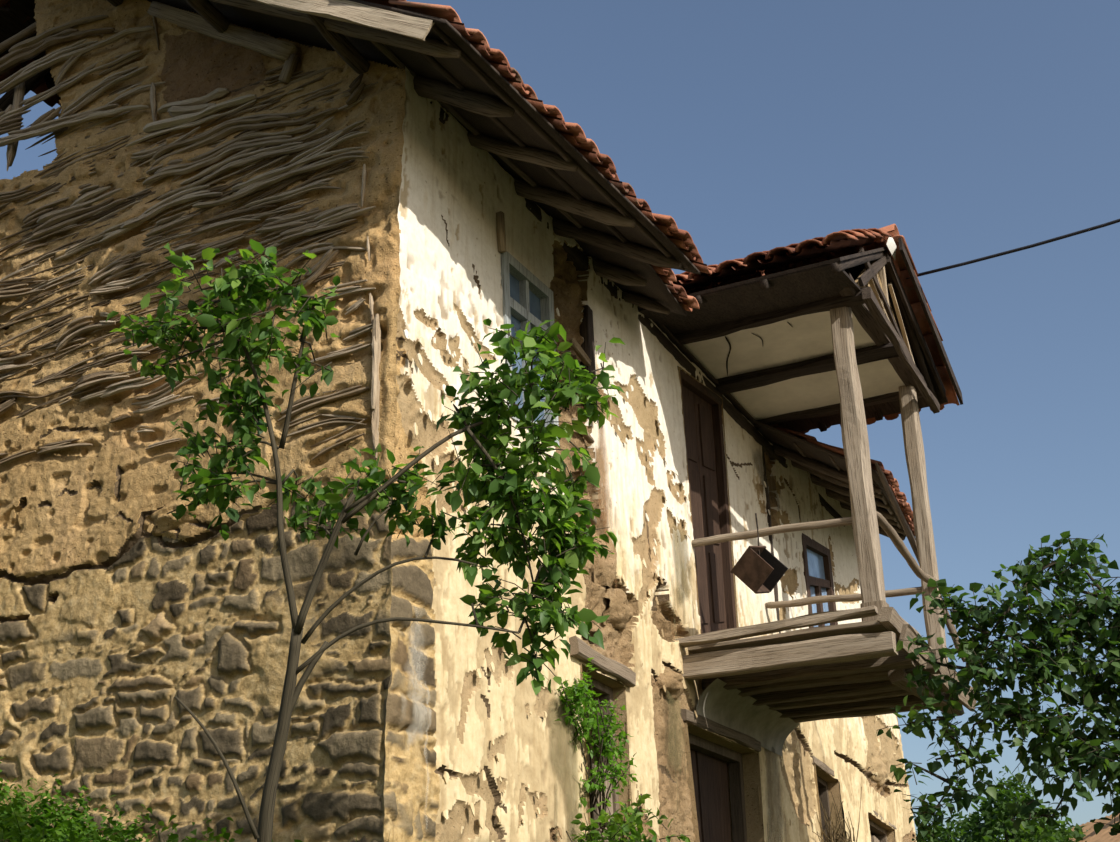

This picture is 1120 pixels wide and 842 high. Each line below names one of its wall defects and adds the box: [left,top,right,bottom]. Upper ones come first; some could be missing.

spalling [549,240,591,382]
flaking render [391,302,498,542]
crack [0,464,262,586]
spalling [555,373,690,670]
crack [0,614,30,623]
flaking render [457,646,514,744]
flaking render [525,686,553,719]
flaking render [435,733,562,842]